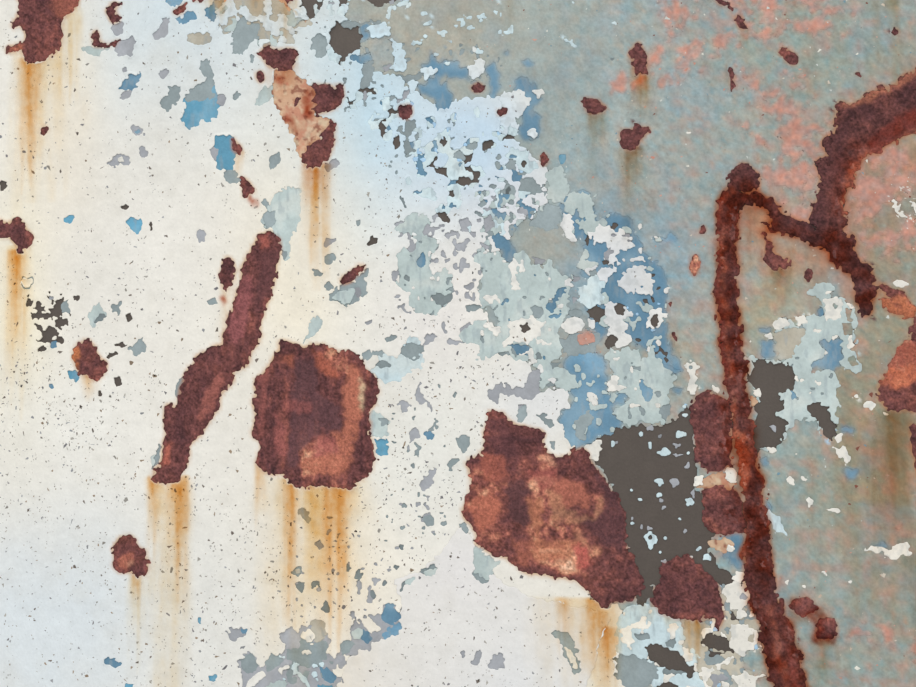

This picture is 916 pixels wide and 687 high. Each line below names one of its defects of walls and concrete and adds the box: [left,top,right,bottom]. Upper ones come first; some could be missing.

corrosion [6,0,79,64]
corrosion [294,83,345,169]
corrosion [151,231,282,485]
corrosion [252,339,380,490]
peeling [743,268,862,479]
corrosion [111,534,151,578]
peeling [391,468,447,535]
corrosion [461,409,724,631]
peeling [630,517,667,563]
peeling [766,502,787,536]
peeling [237,555,402,687]
peeling [551,630,581,675]